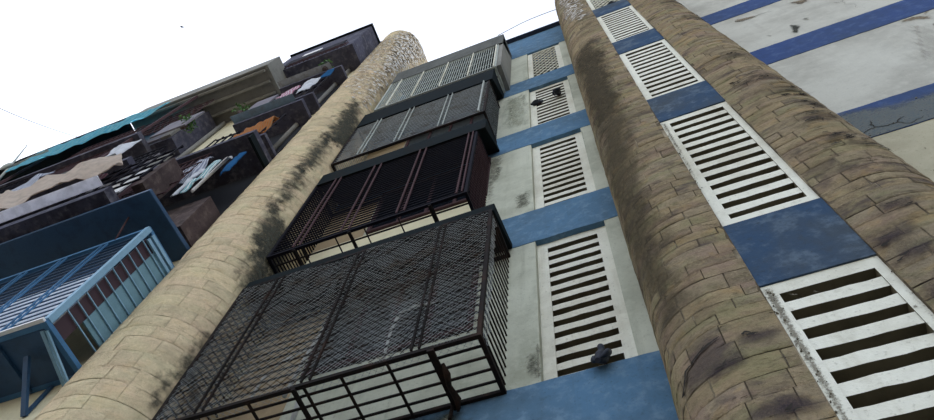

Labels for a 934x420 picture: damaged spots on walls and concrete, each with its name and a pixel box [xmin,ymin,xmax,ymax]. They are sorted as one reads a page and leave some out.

water stain [241,99,359,288]